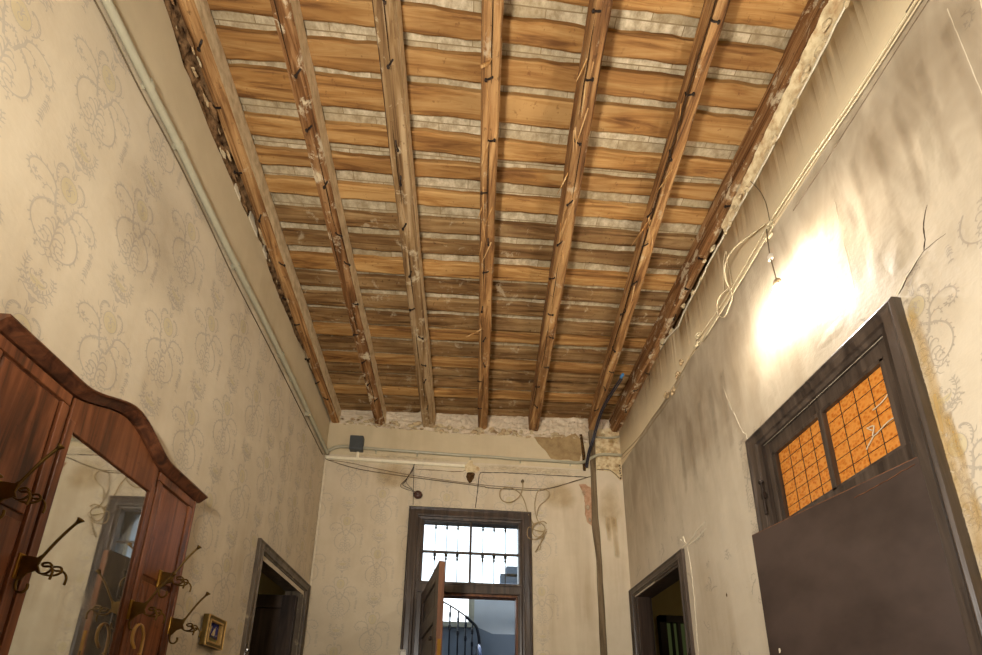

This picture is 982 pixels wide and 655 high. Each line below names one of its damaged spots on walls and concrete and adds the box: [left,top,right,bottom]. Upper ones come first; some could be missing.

spalling [163,0,316,380]
spalling [659,0,850,350]
flaking render [330,410,622,483]